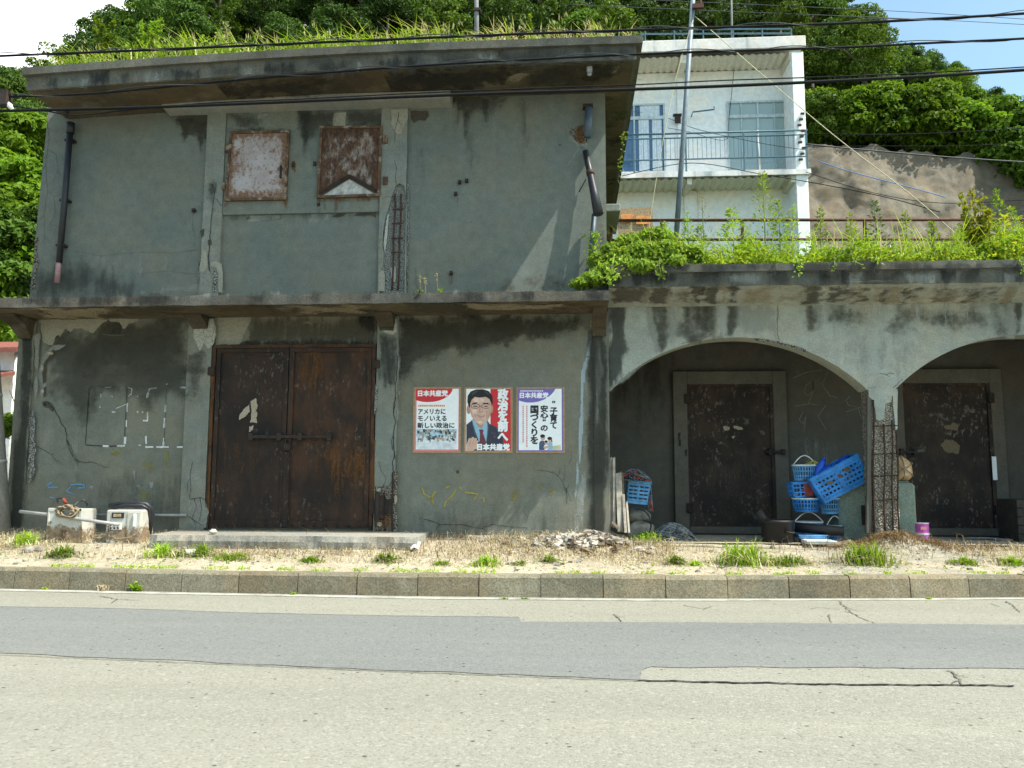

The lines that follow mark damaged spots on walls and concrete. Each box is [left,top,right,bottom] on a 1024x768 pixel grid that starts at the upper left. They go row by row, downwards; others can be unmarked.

spalling [333,183,410,294]
damp [785,260,923,329]
damp [962,264,1024,320]
crack [40,404,109,468]
peeling [28,319,139,483]
damp [22,294,202,411]
spalling [872,400,900,533]